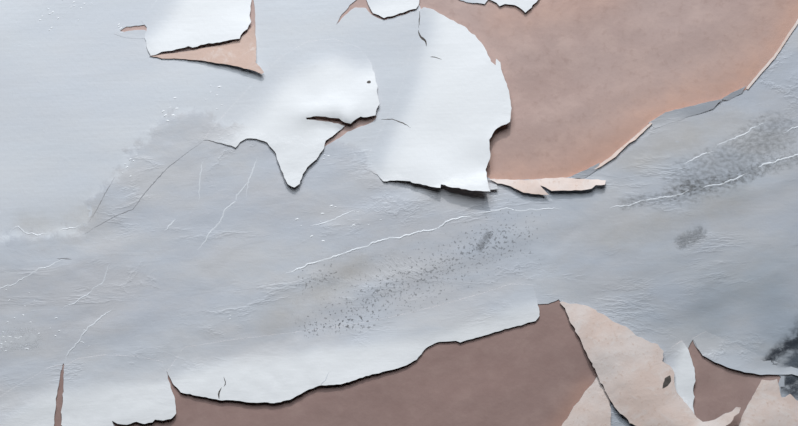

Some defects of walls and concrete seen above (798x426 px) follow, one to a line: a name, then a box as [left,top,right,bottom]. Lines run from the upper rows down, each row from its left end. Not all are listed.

peeling [116,0,798,195]
crack [10,145,203,236]
crack [197,159,257,251]
crack [287,207,557,273]
crack [611,154,798,208]
crack [685,123,763,165]
peeling [0,284,798,426]
water stain [765,337,798,394]